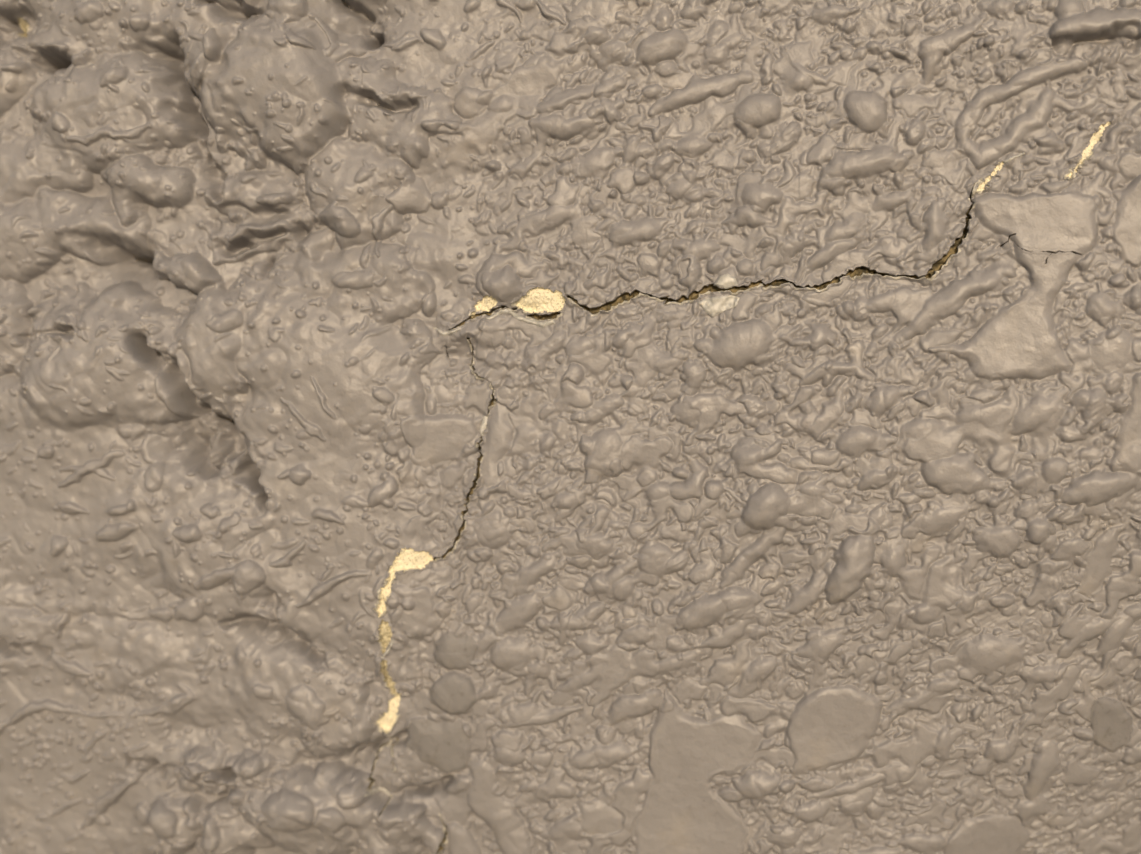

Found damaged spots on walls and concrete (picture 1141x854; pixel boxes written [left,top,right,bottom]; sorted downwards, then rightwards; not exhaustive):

crack [564,181,977,318]
crack [996,231,1086,268]
crack [433,334,498,563]
crack [362,733,400,822]
crack [433,811,449,854]